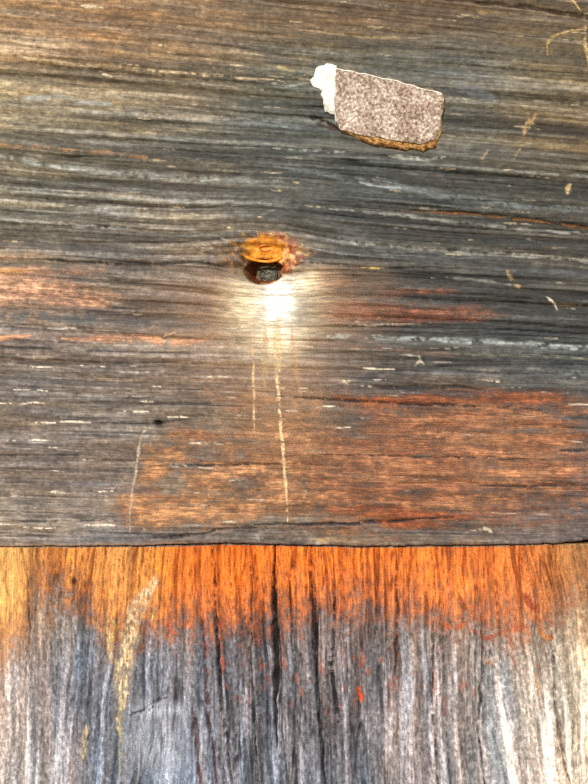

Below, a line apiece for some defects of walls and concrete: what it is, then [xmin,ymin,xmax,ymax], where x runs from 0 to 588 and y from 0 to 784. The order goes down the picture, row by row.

rust [205,232,307,285]
crack [283,517,448,525]
crack [192,570,233,783]
crack [248,627,256,716]
crack [273,545,313,746]
crack [311,585,338,784]
crack [430,625,438,780]
crack [476,619,485,784]
crack [553,690,571,784]